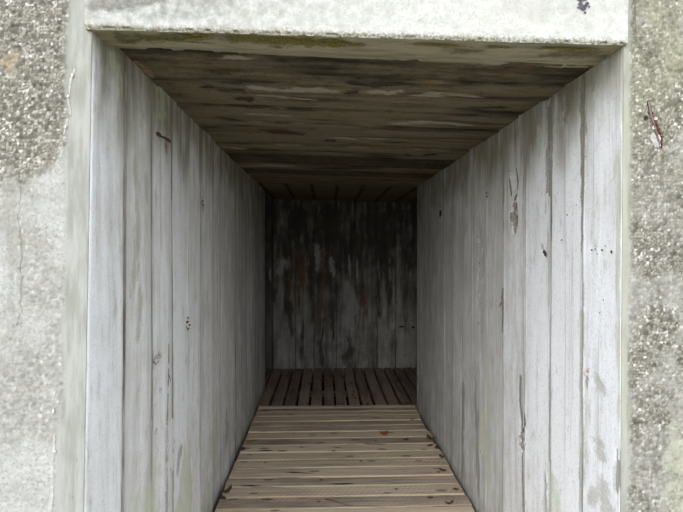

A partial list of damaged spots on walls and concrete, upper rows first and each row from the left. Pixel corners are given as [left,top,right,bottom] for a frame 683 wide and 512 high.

damp [189,61,605,512]
peeling [507,168,519,234]